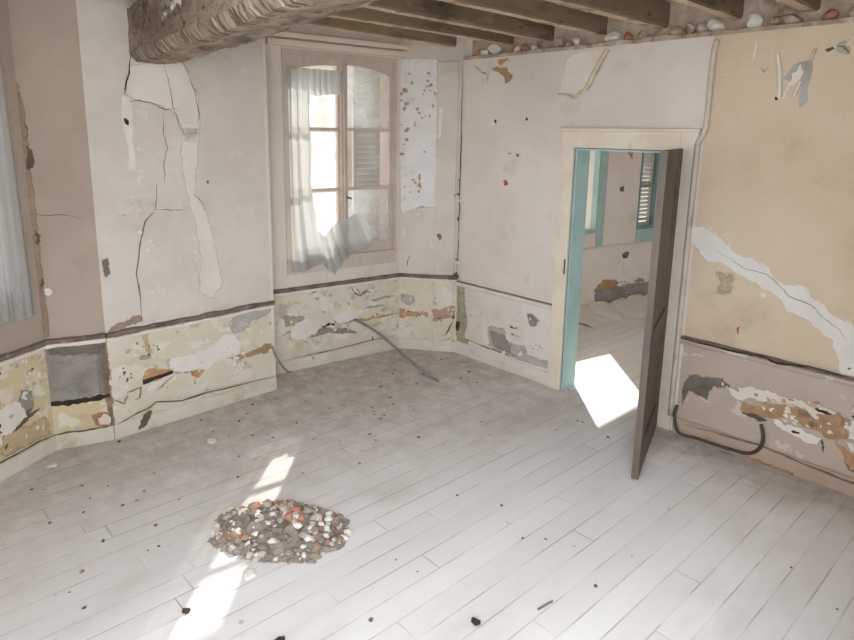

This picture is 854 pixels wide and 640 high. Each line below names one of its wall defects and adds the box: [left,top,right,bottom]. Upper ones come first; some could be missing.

peeling [558,50,609,99]
peeling [752,35,854,108]
peeling [400,58,443,216]
crack [122,55,205,323]
peeling [109,311,272,401]
peeling [287,288,455,345]
spalling [597,277,644,292]
crack [714,250,846,340]
peeling [0,364,45,455]
spalling [722,382,854,472]